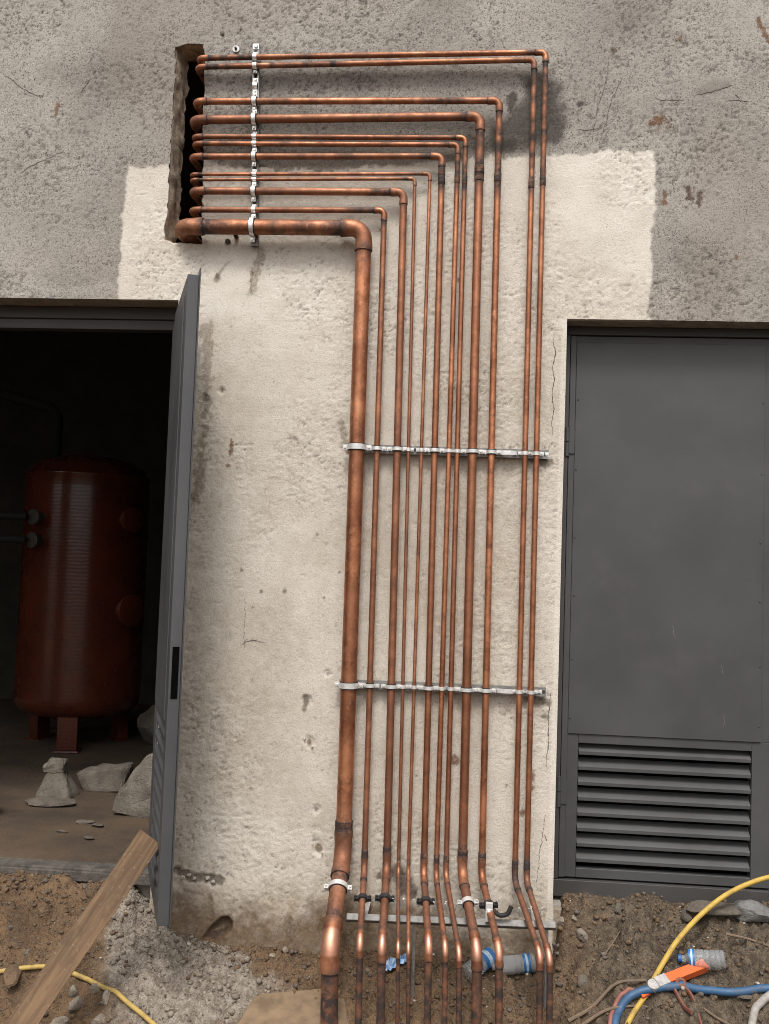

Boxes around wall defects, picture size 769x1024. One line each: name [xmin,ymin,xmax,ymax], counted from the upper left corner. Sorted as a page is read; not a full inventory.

water stain [489,77,564,149]
crack [549,339,557,435]
crack [544,693,552,763]